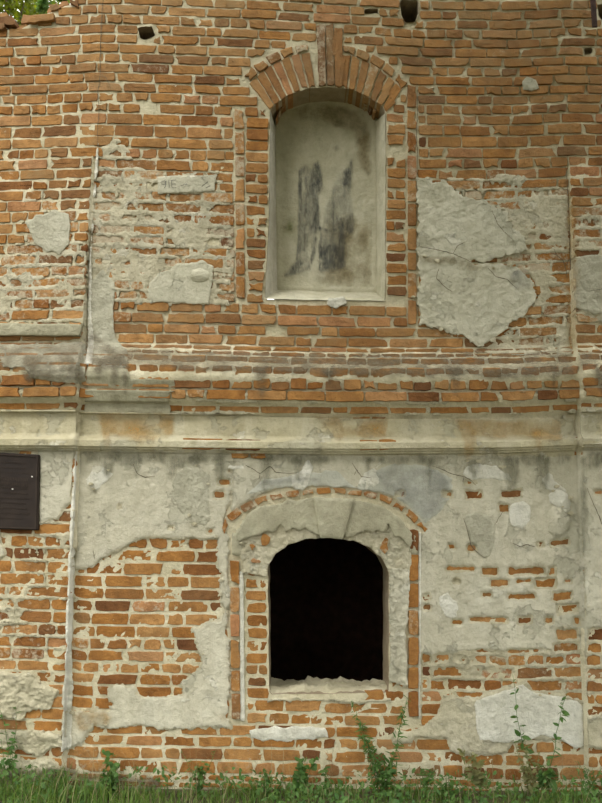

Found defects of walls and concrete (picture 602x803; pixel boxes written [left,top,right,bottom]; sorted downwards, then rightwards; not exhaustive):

crack [423,242,469,291]
damp [0,336,572,390]
peeling [239,525,320,576]
peeling [343,524,412,572]
spalling [447,543,478,553]
spalling [536,537,571,548]
spalling [0,497,229,719]
peeling [0,564,602,792]